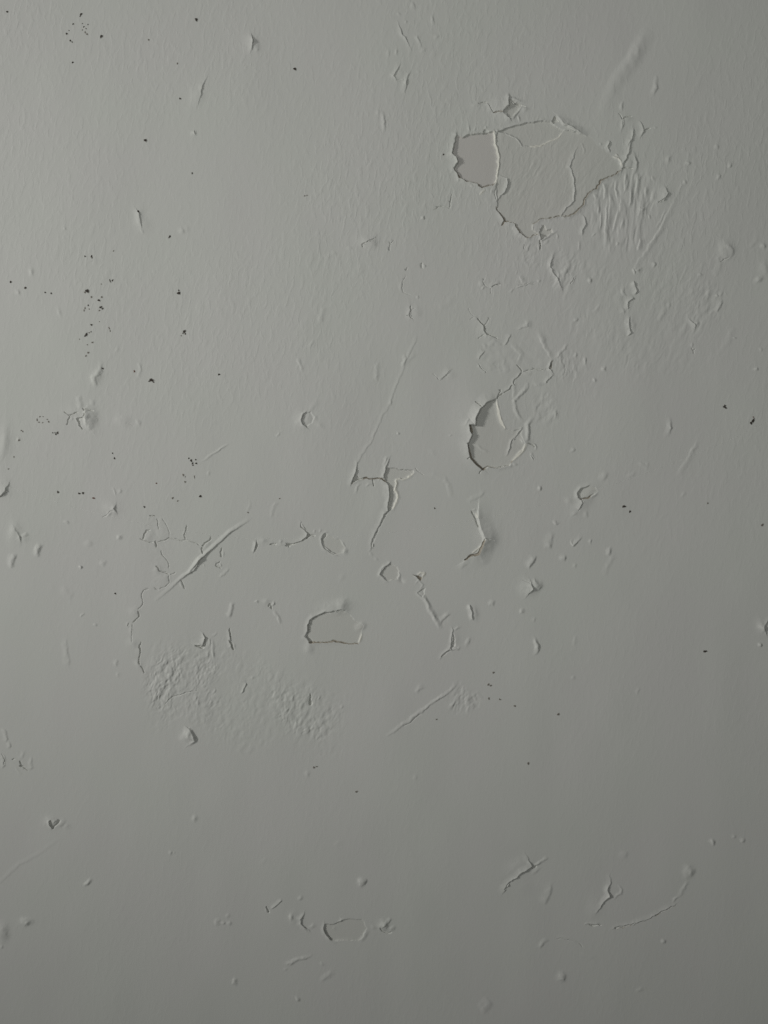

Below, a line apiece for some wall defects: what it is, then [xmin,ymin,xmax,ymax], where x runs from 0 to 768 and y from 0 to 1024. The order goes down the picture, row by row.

crack [468,275,541,343]
peeling [448,389,537,480]
crack [459,500,504,569]
crack [126,516,322,674]
peeling [303,598,367,655]
crack [501,855,553,904]